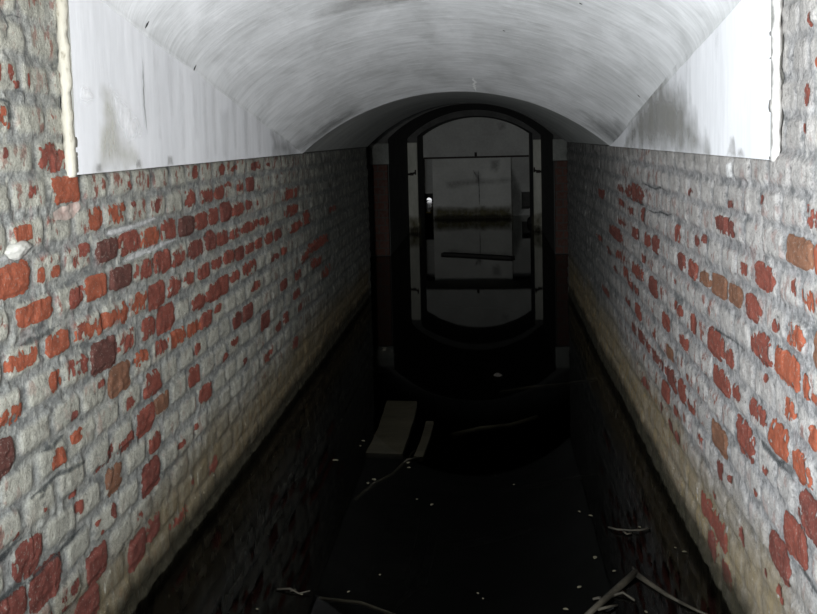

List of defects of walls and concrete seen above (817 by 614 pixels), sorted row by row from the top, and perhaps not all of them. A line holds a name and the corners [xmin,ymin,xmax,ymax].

peeling [0,64,30,89]
peeling [0,106,10,129]
damp [631,86,696,147]
peeling [38,142,136,231]
peeling [715,200,735,238]
peeling [807,204,817,229]
peeling [280,234,331,312]
peeling [0,162,310,518]
peeling [596,182,697,445]
peeling [674,224,817,605]
peeling [0,519,108,614]
peeling [127,504,188,573]